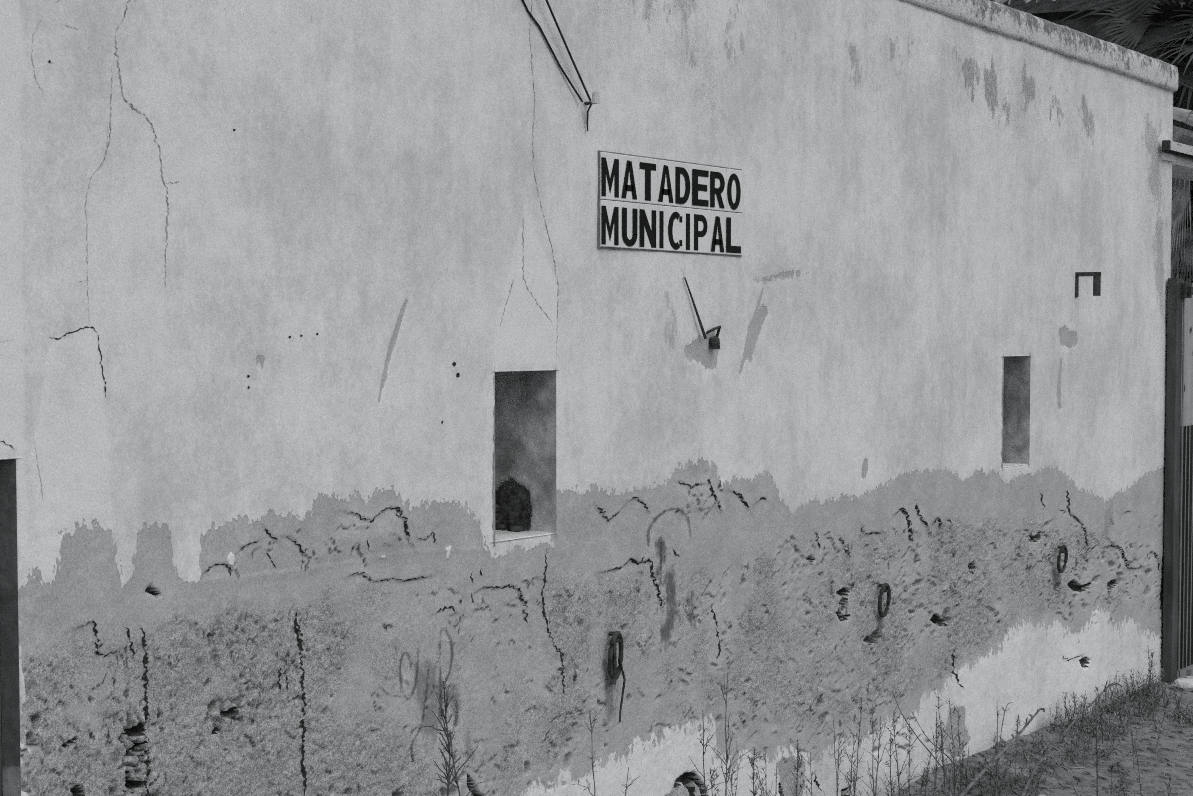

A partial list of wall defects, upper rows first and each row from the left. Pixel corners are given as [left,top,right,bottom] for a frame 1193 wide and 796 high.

crack [50,0,179,398]
crack [352,507,436,582]
crack [598,497,649,521]
crack [679,479,766,511]
crack [816,505,952,552]
crack [437,549,565,697]
peeling [18,457,1165,796]
crack [77,620,152,796]
crack [277,607,307,796]